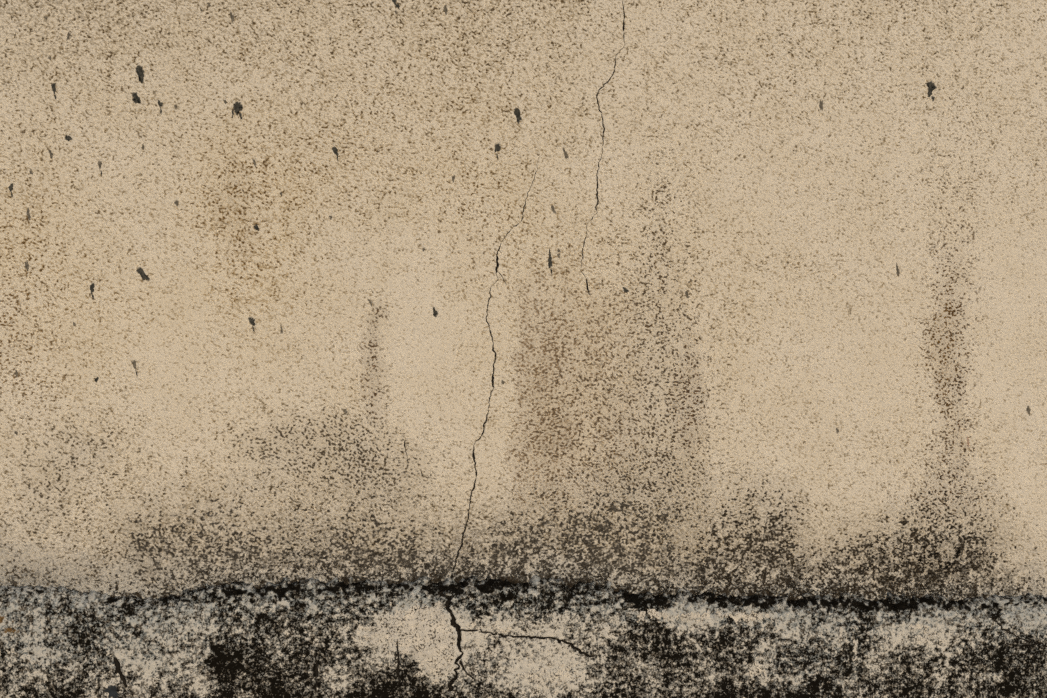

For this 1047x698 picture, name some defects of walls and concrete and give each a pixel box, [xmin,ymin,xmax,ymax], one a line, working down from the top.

crack [580,1,625,295]
leakage [0,557,95,599]
leakage [18,426,104,523]
crack [438,156,599,692]
leakage [95,225,1047,620]